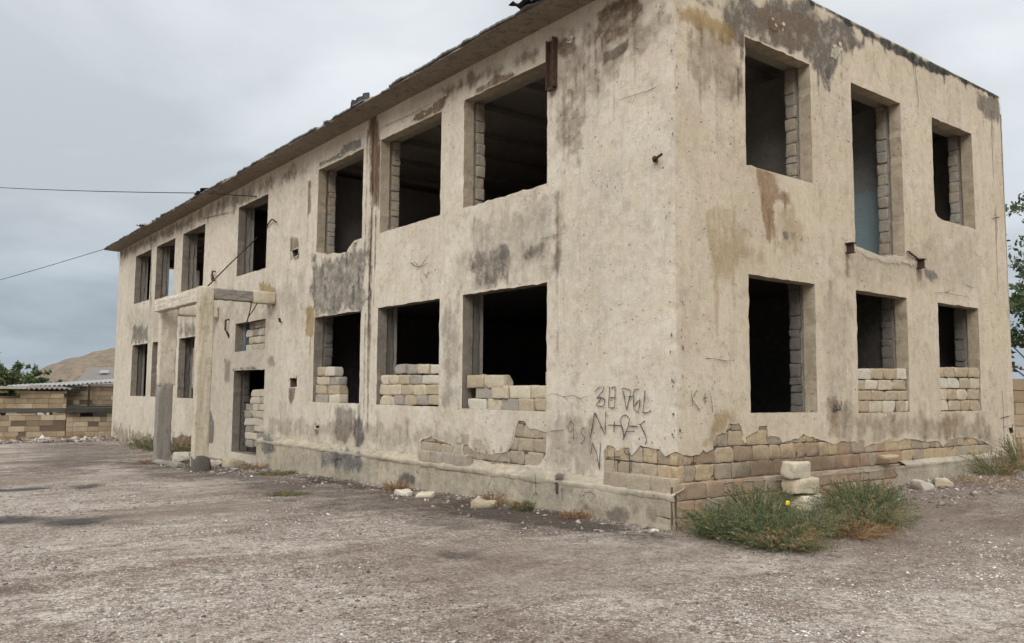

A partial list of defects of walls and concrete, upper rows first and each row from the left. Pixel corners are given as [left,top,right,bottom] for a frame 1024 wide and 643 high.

damp [681,0,873,86]
damp [978,95,1000,121]
damp [367,116,380,205]
corrosion [757,169,789,238]
damp [306,222,376,336]
damp [321,419,364,471]
spalling [416,410,547,481]
spalling [594,424,992,531]